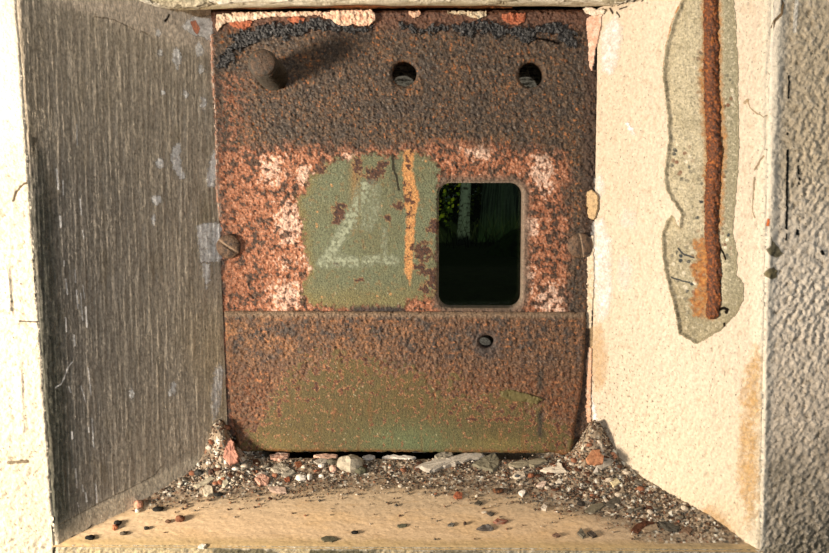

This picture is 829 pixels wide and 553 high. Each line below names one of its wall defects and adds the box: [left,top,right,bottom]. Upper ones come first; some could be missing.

crack [609,0,643,18]
spalling [661,0,744,344]
corrosion [690,238,708,317]